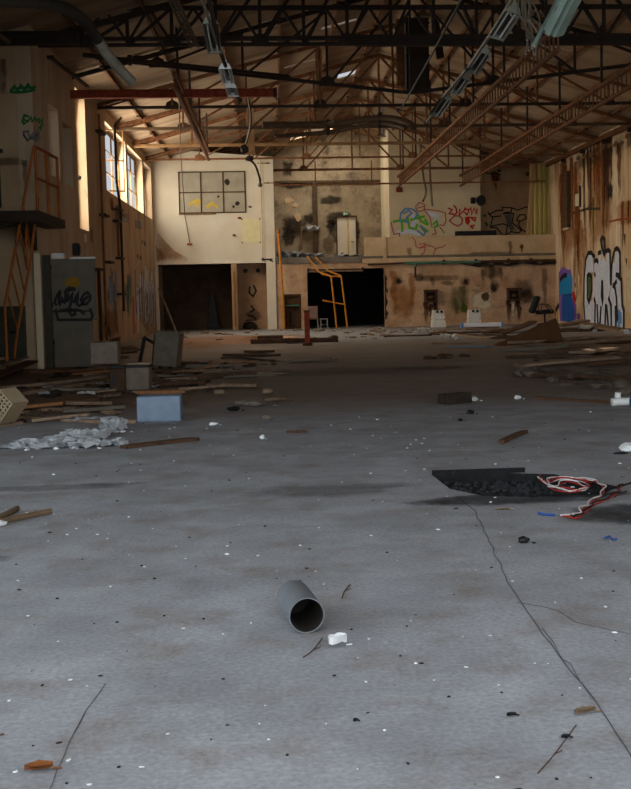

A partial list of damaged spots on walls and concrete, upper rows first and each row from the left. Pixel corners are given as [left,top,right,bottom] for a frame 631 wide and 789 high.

leakage [282,226,294,245]
leakage [321,196,341,204]
corrosion [559,131,621,264]
crack [456,496,631,756]